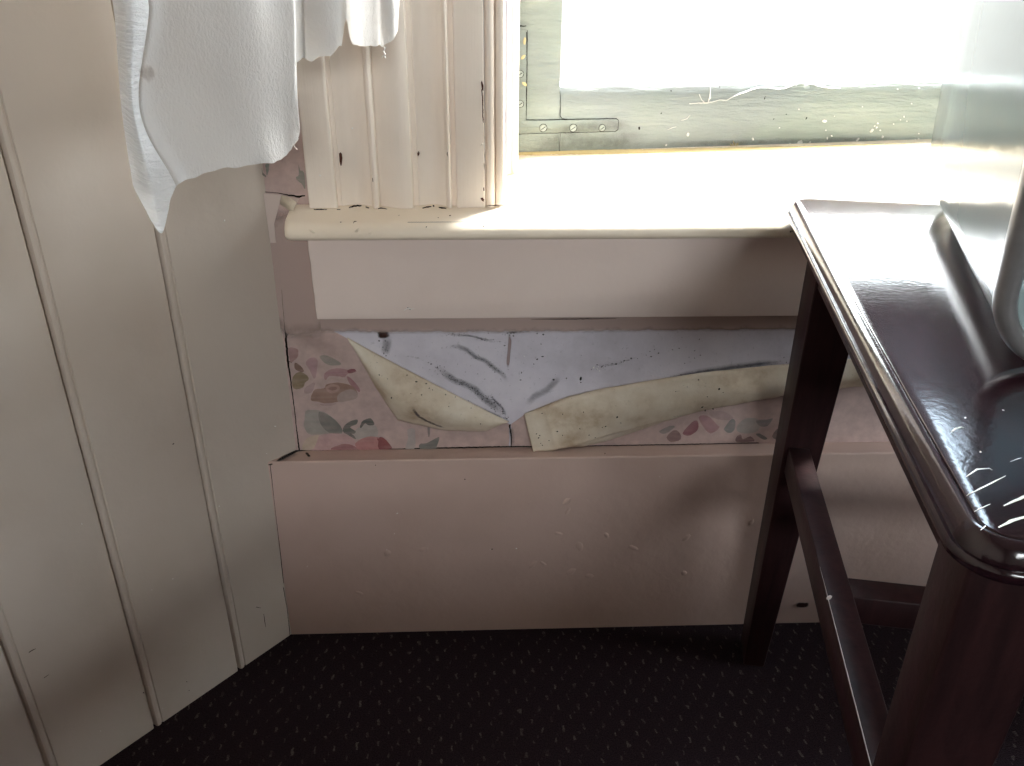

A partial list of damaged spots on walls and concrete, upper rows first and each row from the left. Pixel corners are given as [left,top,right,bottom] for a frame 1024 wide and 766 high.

flaking render [335,328,795,424]